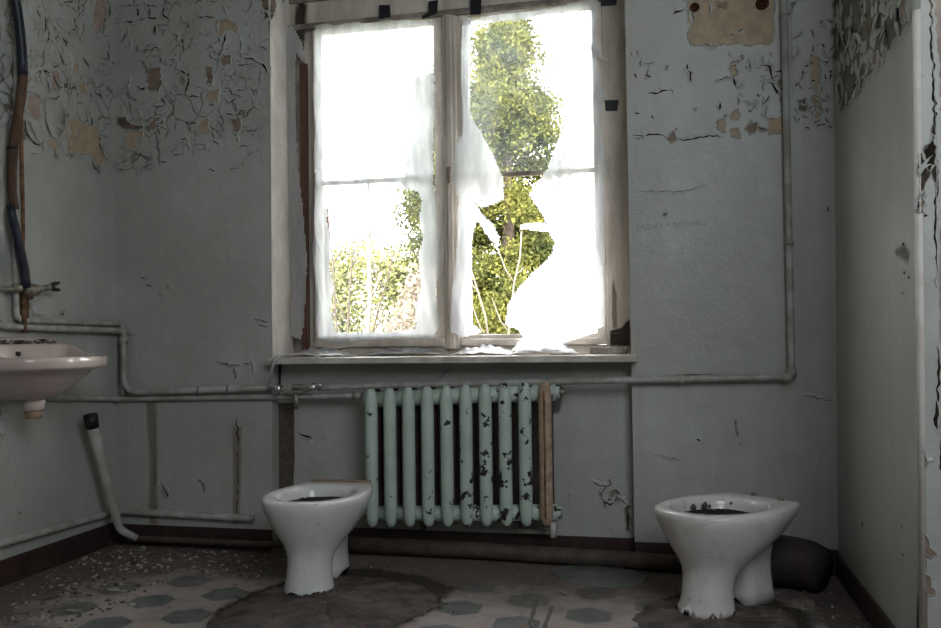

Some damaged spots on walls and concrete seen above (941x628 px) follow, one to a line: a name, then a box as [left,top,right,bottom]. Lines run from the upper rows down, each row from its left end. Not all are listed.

peeling [0,0,23,120]
peeling [23,27,90,157]
peeling [116,66,165,167]
peeling [632,0,912,144]
spalling [914,0,941,340]